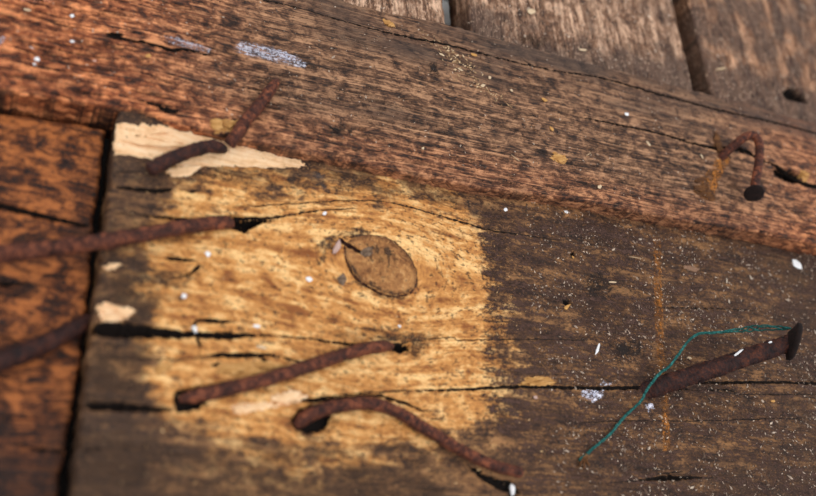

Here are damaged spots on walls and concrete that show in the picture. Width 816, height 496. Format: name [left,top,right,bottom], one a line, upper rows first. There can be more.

crack [93,318,356,369]
crack [393,337,583,345]
crack [679,381,816,400]
crack [301,385,640,420]
crack [582,416,801,424]